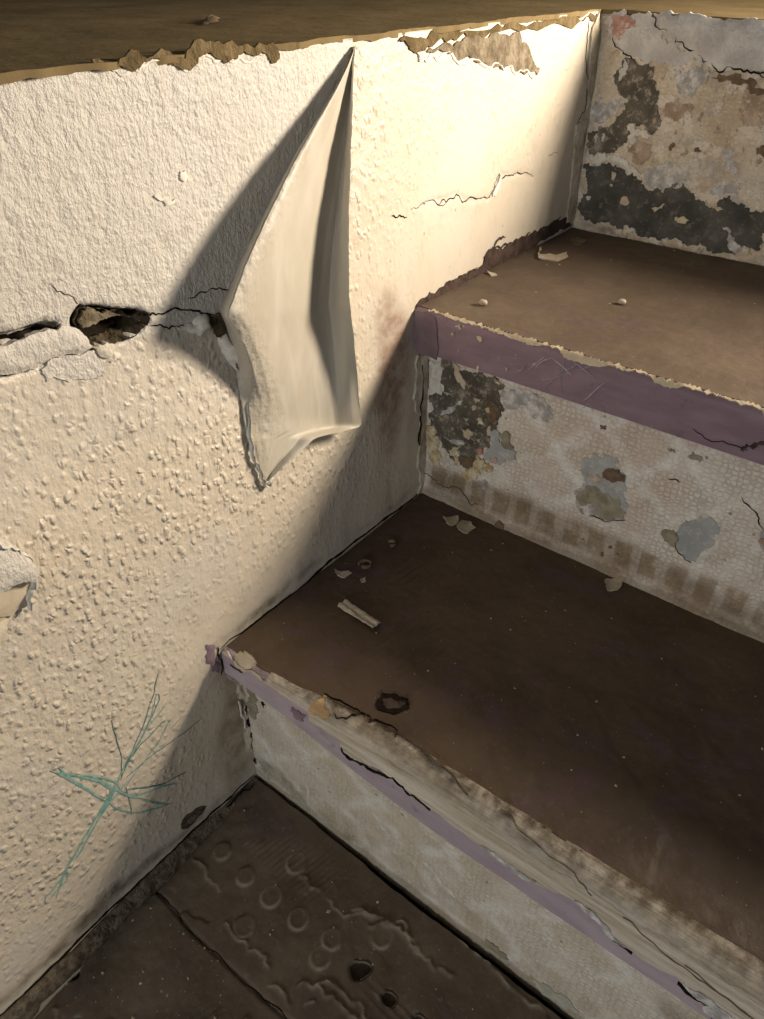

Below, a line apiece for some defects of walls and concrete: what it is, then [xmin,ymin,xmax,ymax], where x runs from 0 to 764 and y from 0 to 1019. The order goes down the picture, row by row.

flaking render [111,39,280,77]
peeling [397,9,764,81]
peeling [588,123,652,187]
crack [392,172,533,218]
peeling [722,227,741,254]
peeling [412,354,498,494]
peeling [443,515,475,534]
peeling [0,538,40,648]
peeling [604,577,624,592]
crack [340,747,431,811]
crack [501,809,592,896]
crack [613,917,754,1019]